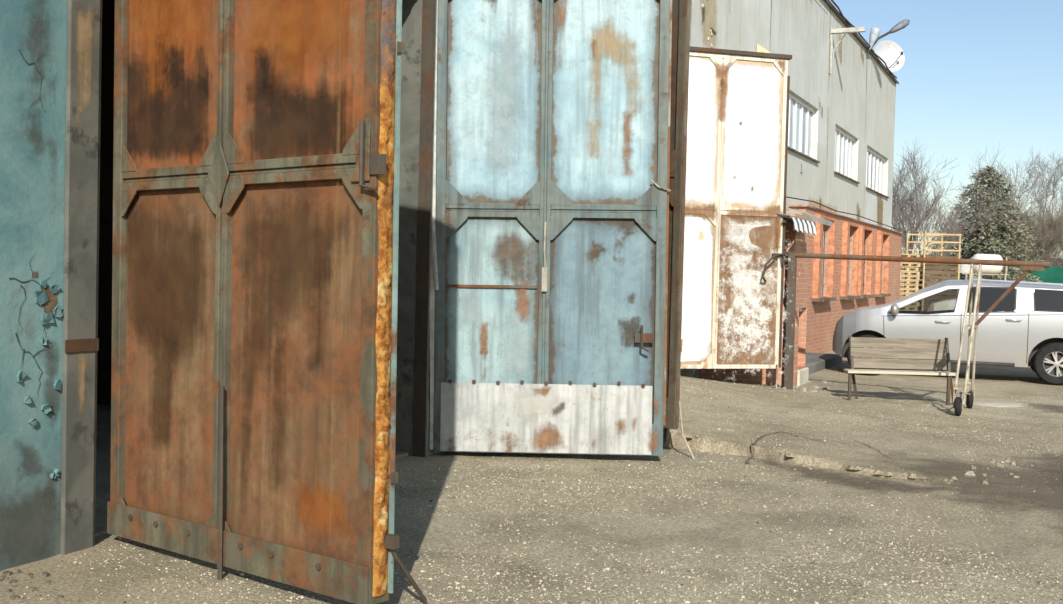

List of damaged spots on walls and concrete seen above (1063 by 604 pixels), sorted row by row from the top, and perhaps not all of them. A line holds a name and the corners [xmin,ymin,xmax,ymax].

corrosion [593,27,636,91]
corrosion [127,48,209,157]
corrosion [247,53,346,160]
corrosion [716,64,729,120]
crack [9,252,53,390]
corrosion [619,319,639,346]
corrosion [534,423,560,447]